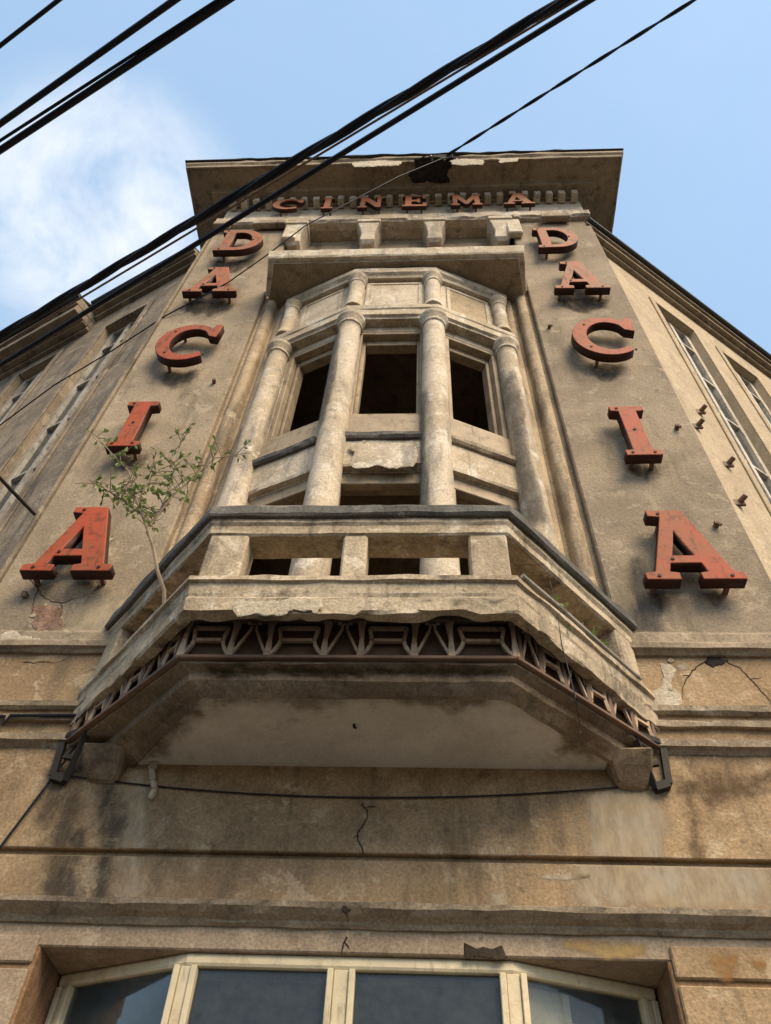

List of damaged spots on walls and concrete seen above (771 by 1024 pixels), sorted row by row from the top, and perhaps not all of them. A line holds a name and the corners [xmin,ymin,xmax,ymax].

spalling [352,154,485,184]
peeling [350,440,420,469]
spalling [0,604,65,639]
peeling [233,596,324,617]
peeling [652,658,688,705]
crack [682,660,771,703]
damp [40,770,84,896]
damp [95,777,145,897]
crack [354,803,375,862]